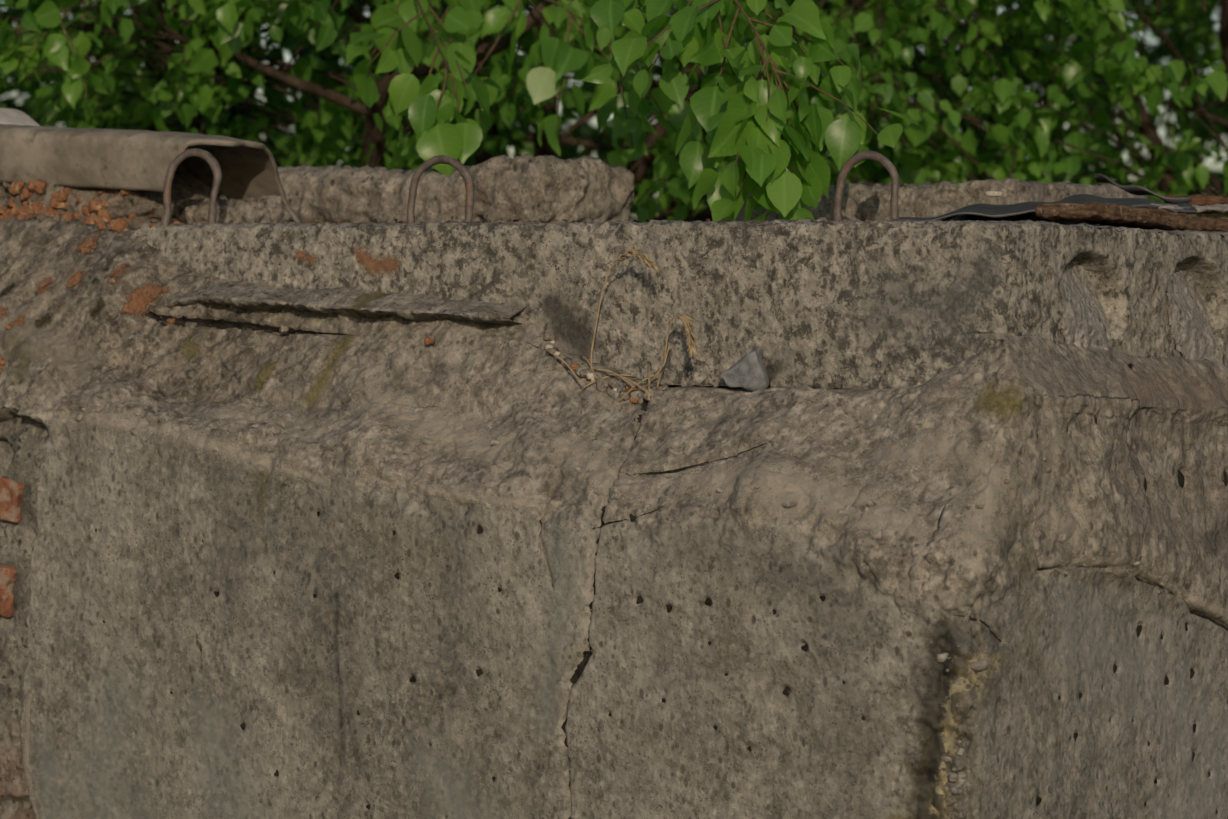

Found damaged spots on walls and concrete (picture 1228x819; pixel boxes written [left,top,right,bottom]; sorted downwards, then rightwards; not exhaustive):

crack [623,398,767,476]
flaking render [0,476,28,523]
flaking render [0,562,25,618]
crack [1037,565,1228,631]
crack [561,501,665,819]